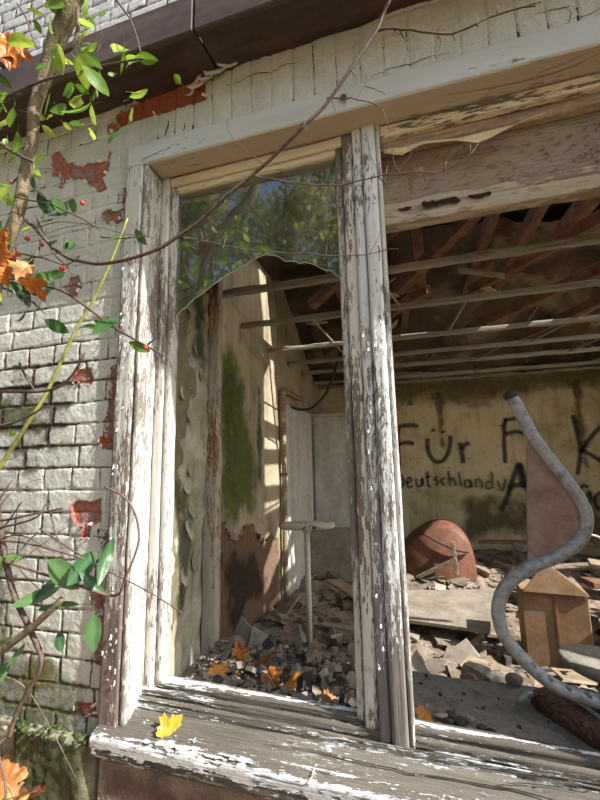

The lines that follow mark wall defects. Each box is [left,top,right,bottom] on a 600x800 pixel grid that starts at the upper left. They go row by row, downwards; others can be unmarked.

crack [449,54,598,95]
spalling [106,62,237,135]
peeling [384,113,545,155]
spalling [51,151,111,192]
spalling [101,209,122,226]
spalling [0,362,94,472]
spalling [70,498,101,541]
peeling [90,728,377,800]